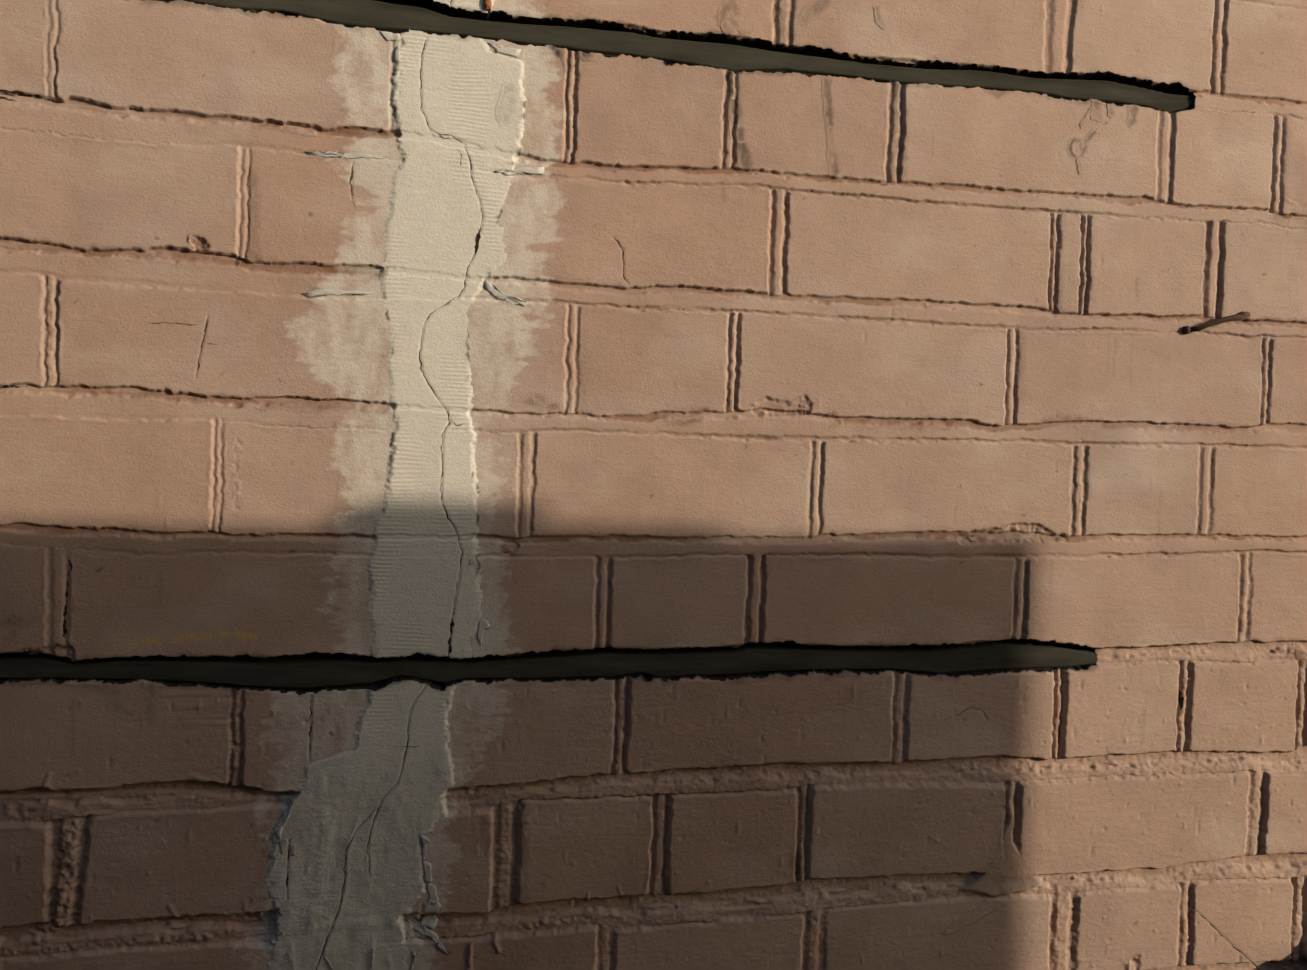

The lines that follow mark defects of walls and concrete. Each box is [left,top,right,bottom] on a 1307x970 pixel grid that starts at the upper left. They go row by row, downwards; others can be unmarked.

crack [0,89,42,101]
crack [348,163,356,208]
crack [614,238,628,283]
crack [153,319,218,377]
crack [419,41,484,657]
crack [63,560,72,645]
crack [307,694,315,756]
crack [316,688,425,970]